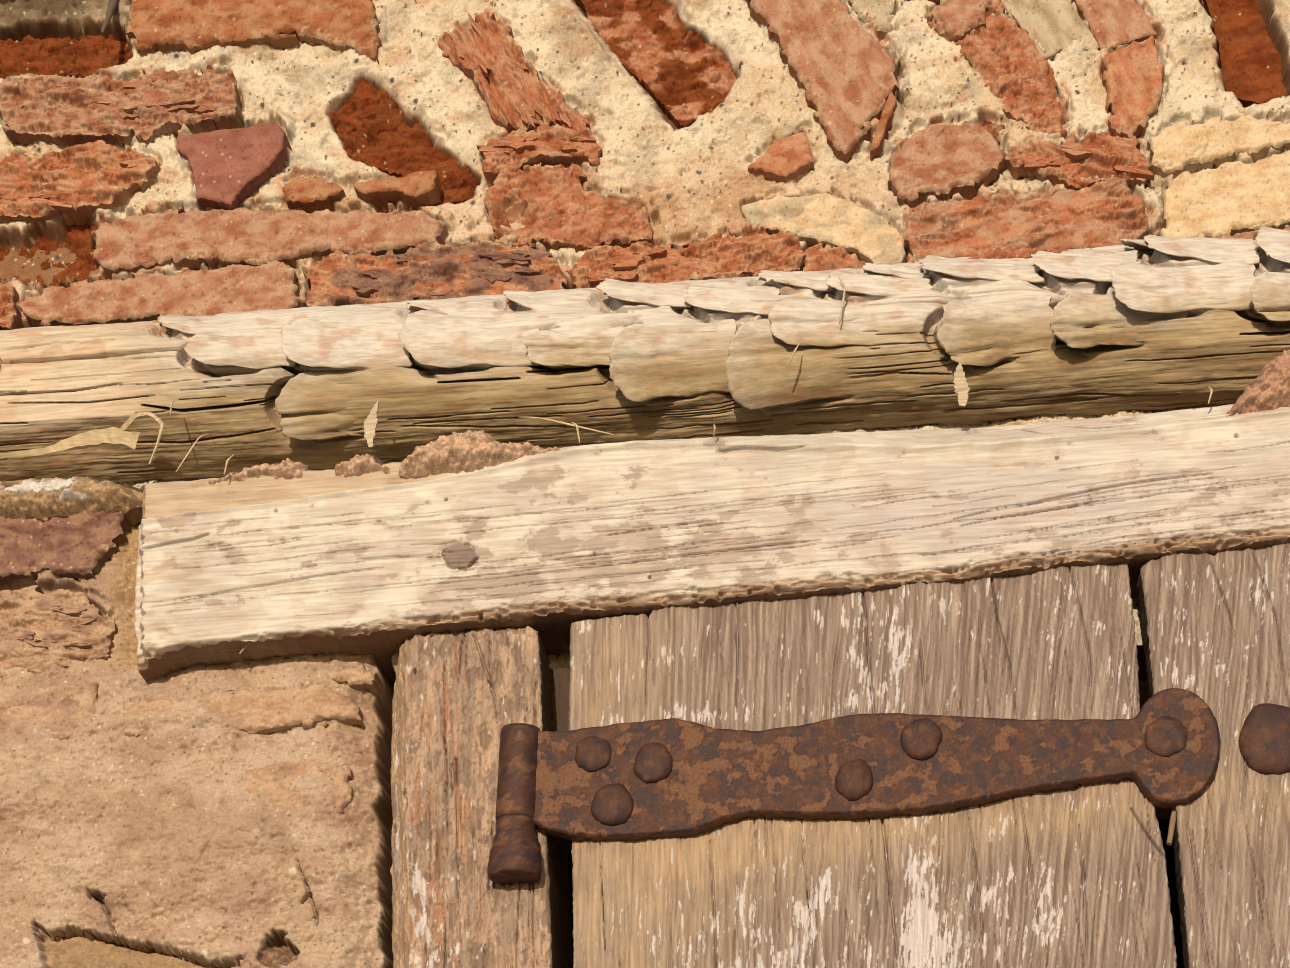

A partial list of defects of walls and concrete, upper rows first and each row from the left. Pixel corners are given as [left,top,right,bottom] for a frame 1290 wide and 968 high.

crack [42,891,243,968]